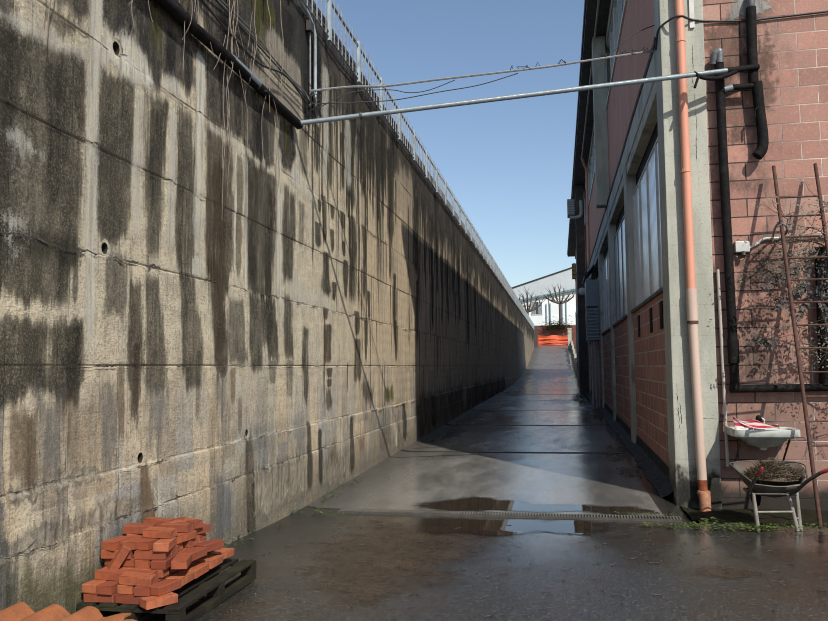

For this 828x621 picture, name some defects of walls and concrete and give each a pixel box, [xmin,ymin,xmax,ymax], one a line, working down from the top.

leakage [0,0,308,467]
crack [1,97,365,274]
crack [0,431,370,559]
crack [0,230,508,495]
leakage [174,0,534,445]